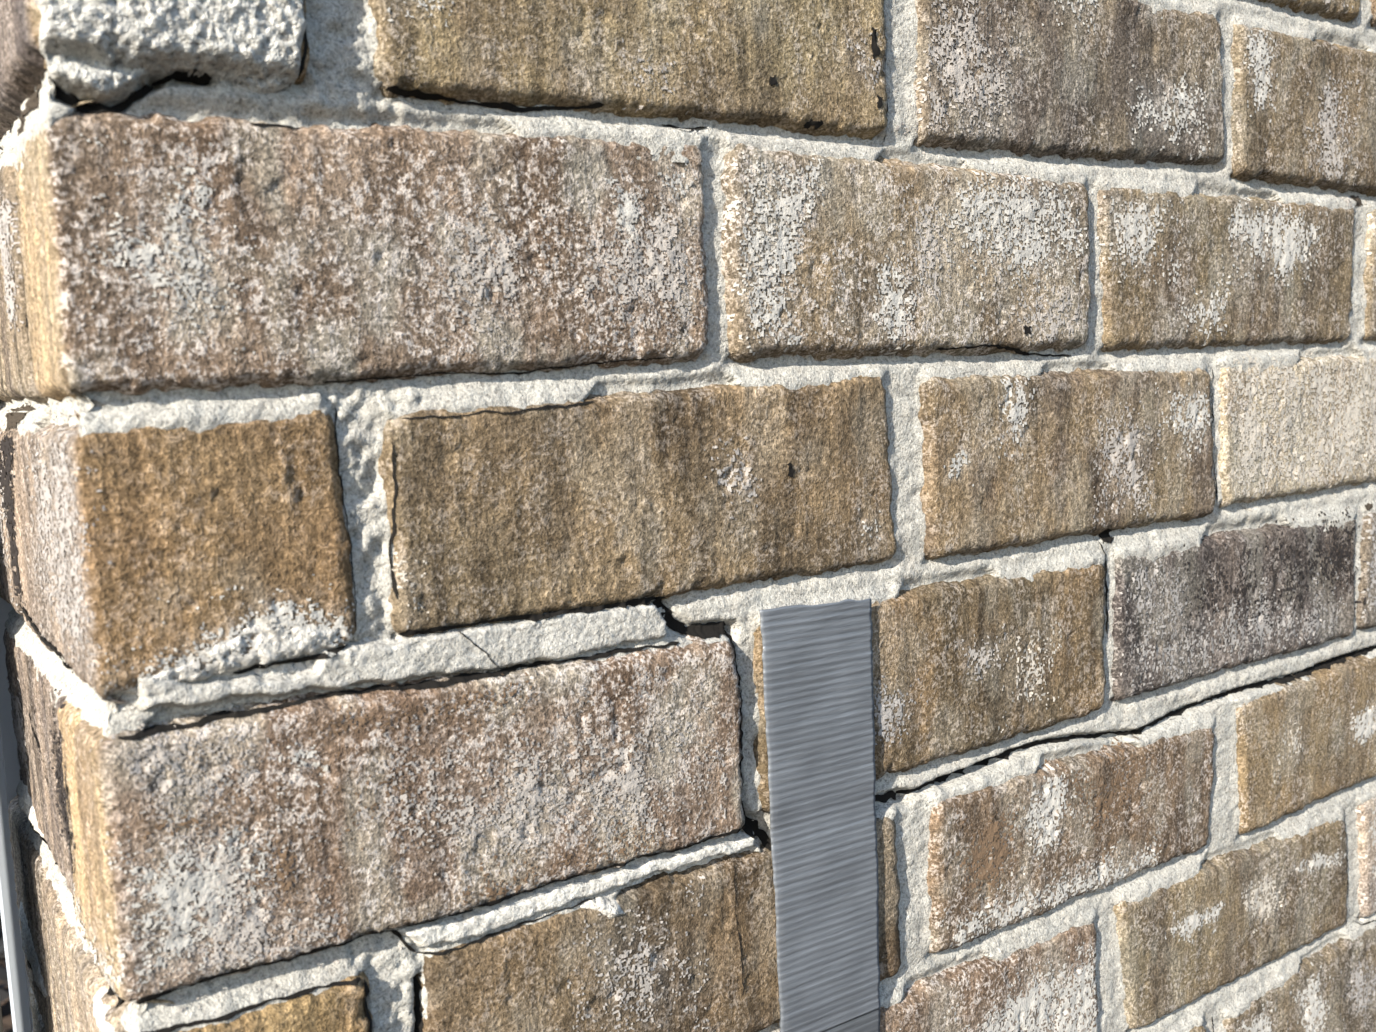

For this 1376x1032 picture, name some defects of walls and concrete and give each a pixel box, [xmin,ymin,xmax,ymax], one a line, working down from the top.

crack [20,604,74,674]
crack [29,712,73,874]
crack [107,357,771,1032]
crack [875,645,1376,803]